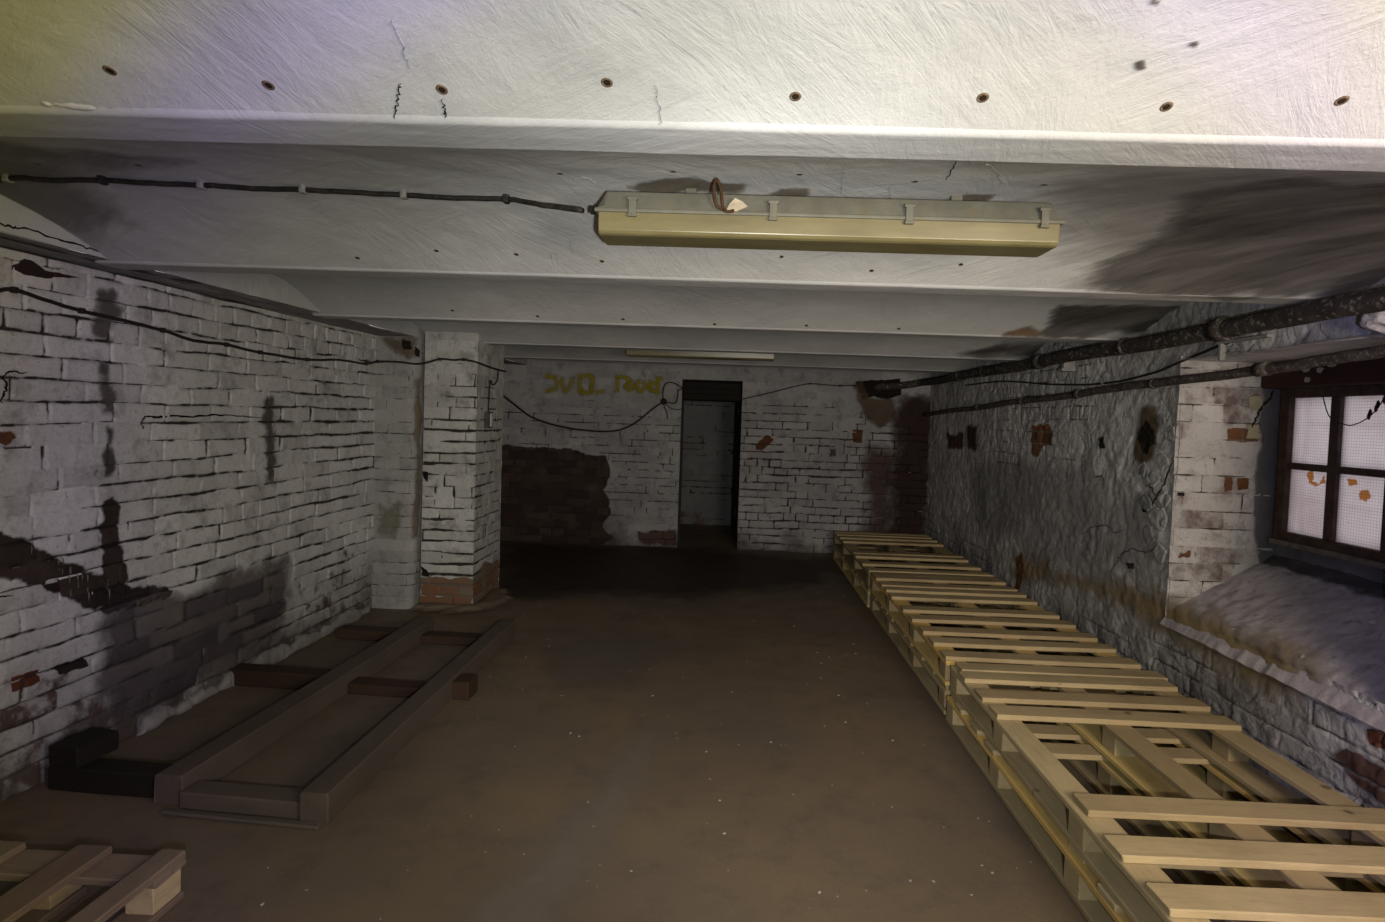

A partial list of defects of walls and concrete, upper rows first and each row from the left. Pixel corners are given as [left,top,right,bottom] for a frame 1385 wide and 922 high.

crack [391,20,410,119]
damp [92,289,122,338]
damp [100,363,116,476]
flaking render [947,432,964,449]
flaking render [1031,424,1053,456]
spalling [1137,420,1155,455]
flaking render [500,444,613,545]
crack [1145,458,1173,505]
flaking render [419,560,499,604]
flaking render [1336,729,1385,804]